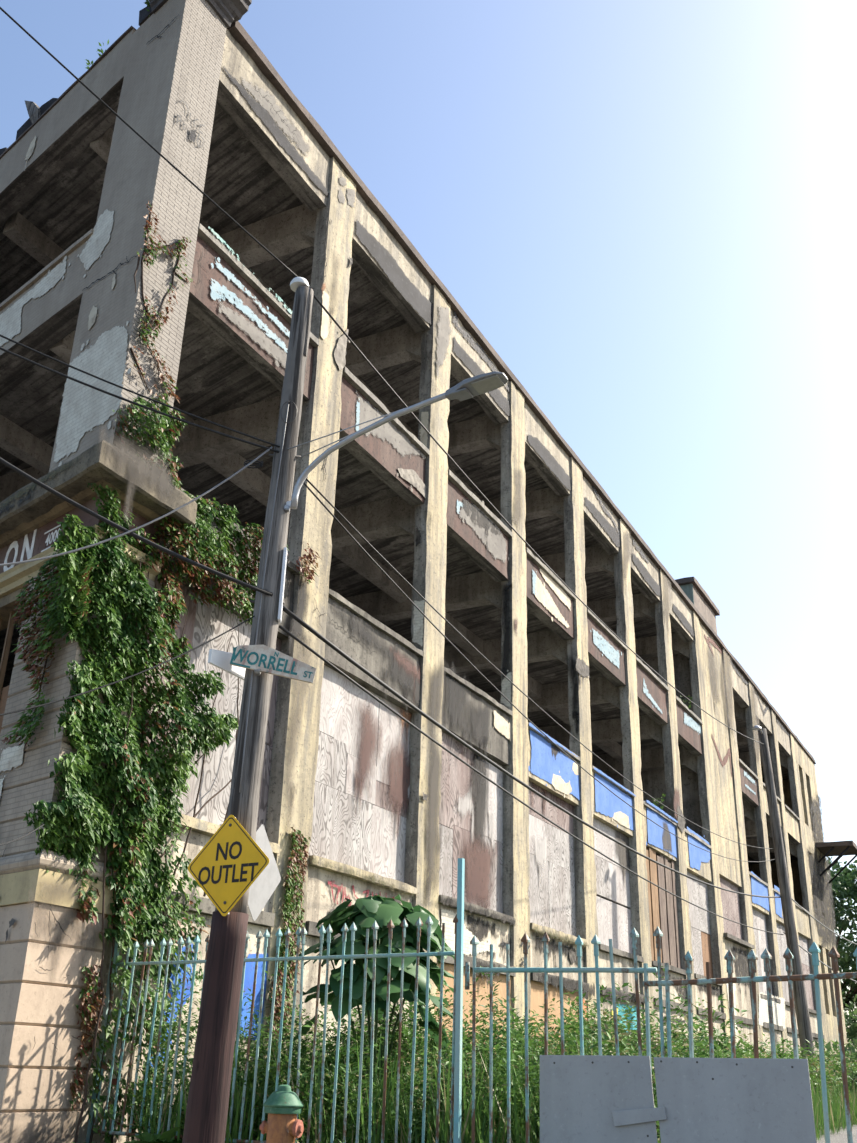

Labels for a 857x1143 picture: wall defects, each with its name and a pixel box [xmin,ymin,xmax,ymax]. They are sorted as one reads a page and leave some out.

leakage [223,67,355,207]
peeling [0,209,114,346]
peeling [54,304,131,467]
peeling [208,227,292,352]
leakage [219,303,287,368]
leakage [356,221,484,389]
leakage [334,603,516,989]
peeling [493,670,512,741]
peeling [528,723,580,800]
peeling [594,767,711,870]
peeling [643,679,663,714]
peeling [684,713,701,735]